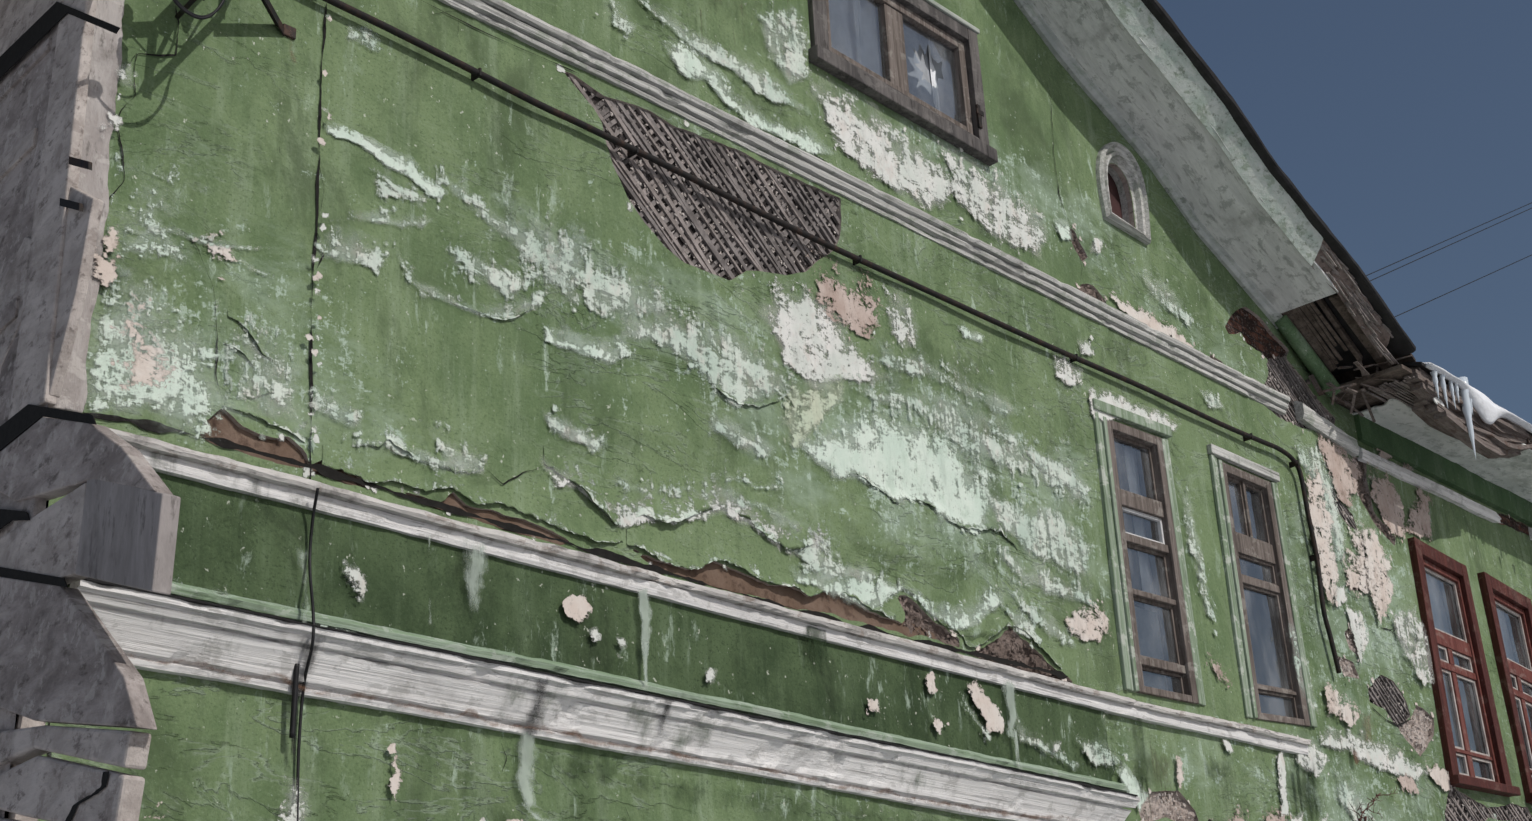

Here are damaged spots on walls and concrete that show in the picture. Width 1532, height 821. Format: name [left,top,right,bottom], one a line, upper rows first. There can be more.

peeling [595,0,632,39]
peeling [641,0,1106,266]
peeling [1075,259,1215,359]
crack [0,2,1068,679]
peeling [86,64,1114,681]
flaking render [963,308,1532,821]
peeling [866,698,880,715]
peeling [925,671,938,694]
peeling [933,717,949,735]
peeling [278,775,305,821]
peeling [387,743,403,801]